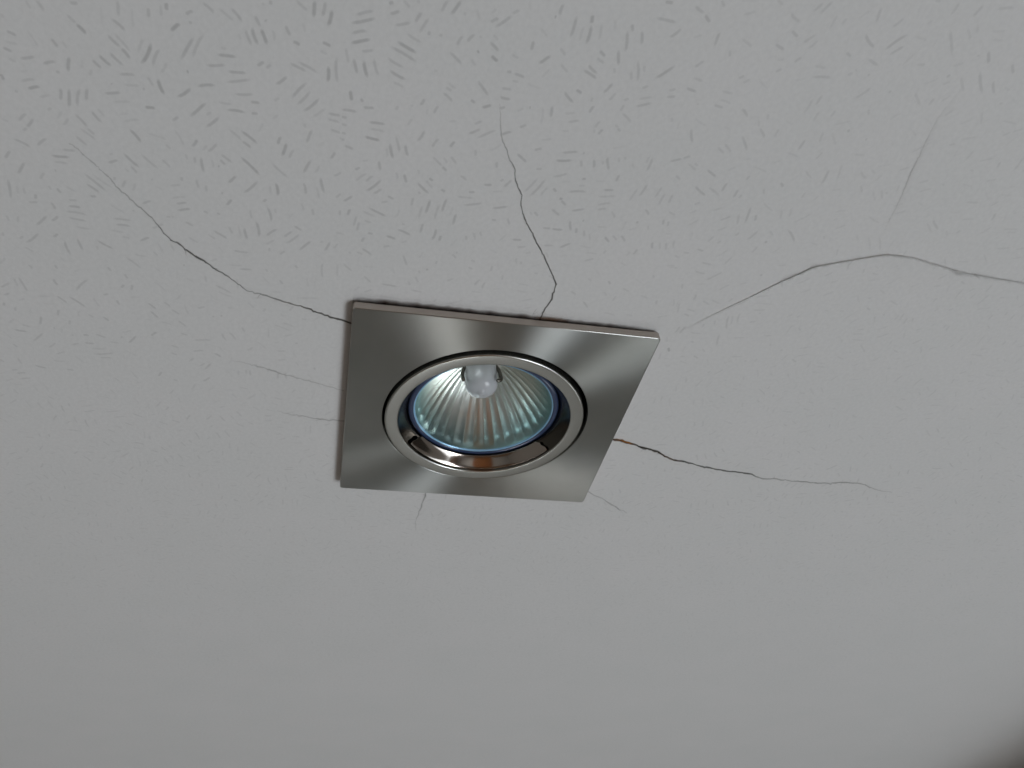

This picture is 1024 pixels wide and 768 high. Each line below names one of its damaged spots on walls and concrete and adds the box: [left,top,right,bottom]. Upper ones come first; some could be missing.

crack [158,225,230,278]
crack [512,163,557,317]
crack [277,299,352,324]
crack [613,439,756,477]